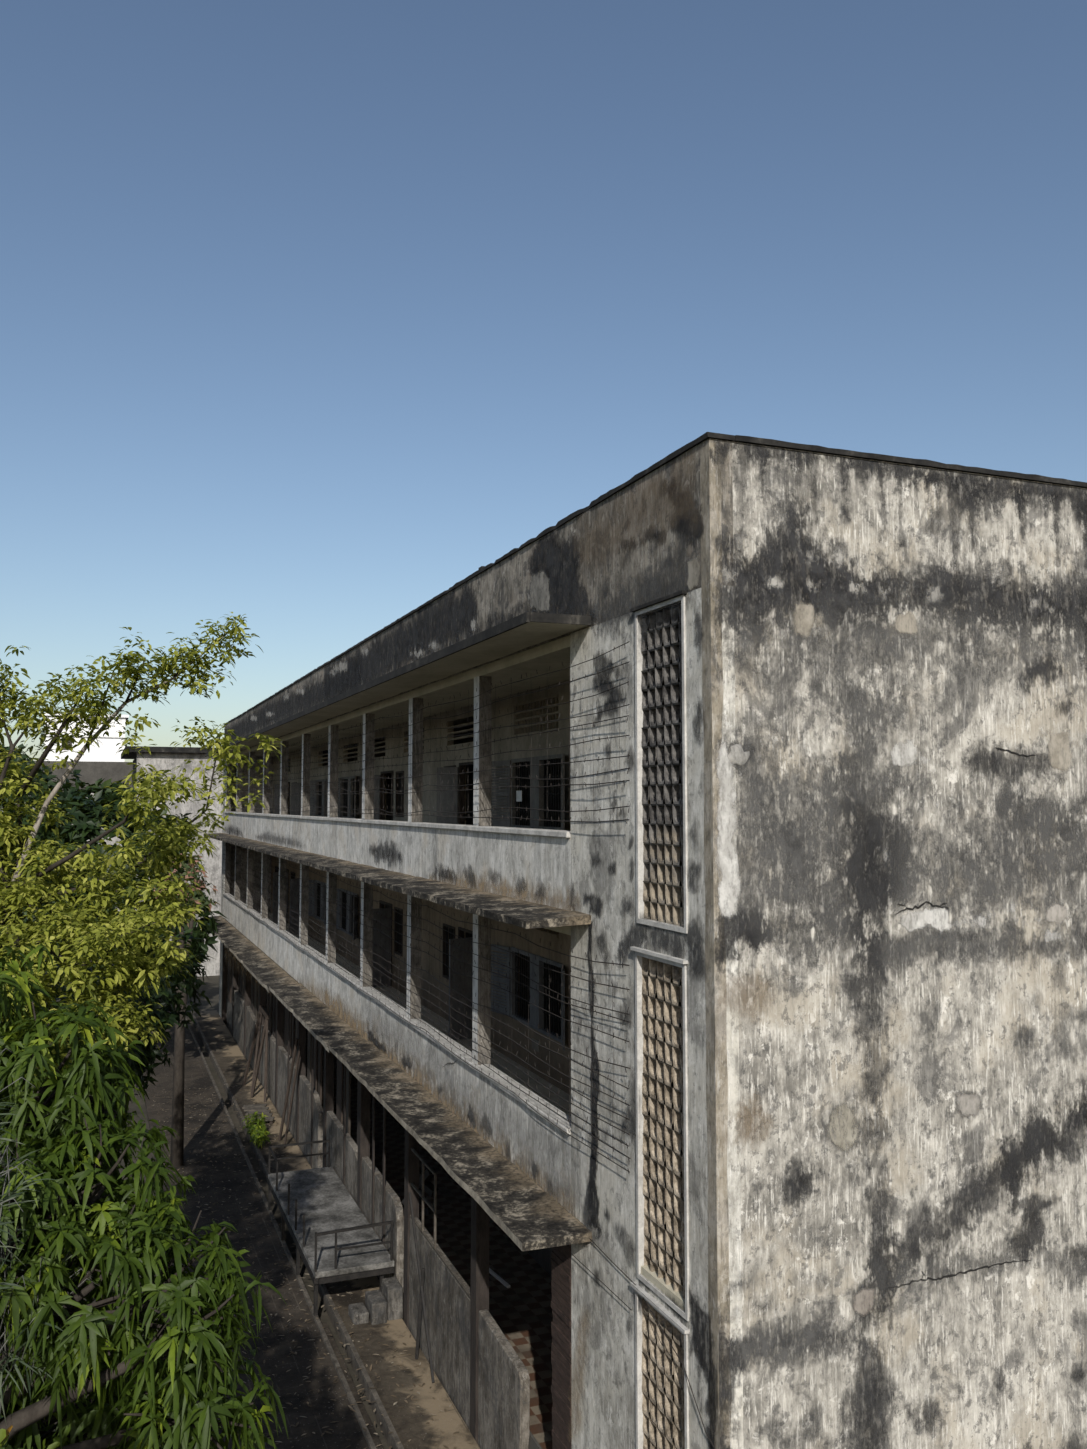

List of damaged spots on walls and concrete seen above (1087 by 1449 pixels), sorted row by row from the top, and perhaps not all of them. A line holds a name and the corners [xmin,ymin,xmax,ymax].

leakage [225,443,1087,1261]
crack [995,747,1035,757]
leakage [627,1083,1087,1449]
crack [887,1260,1032,1289]